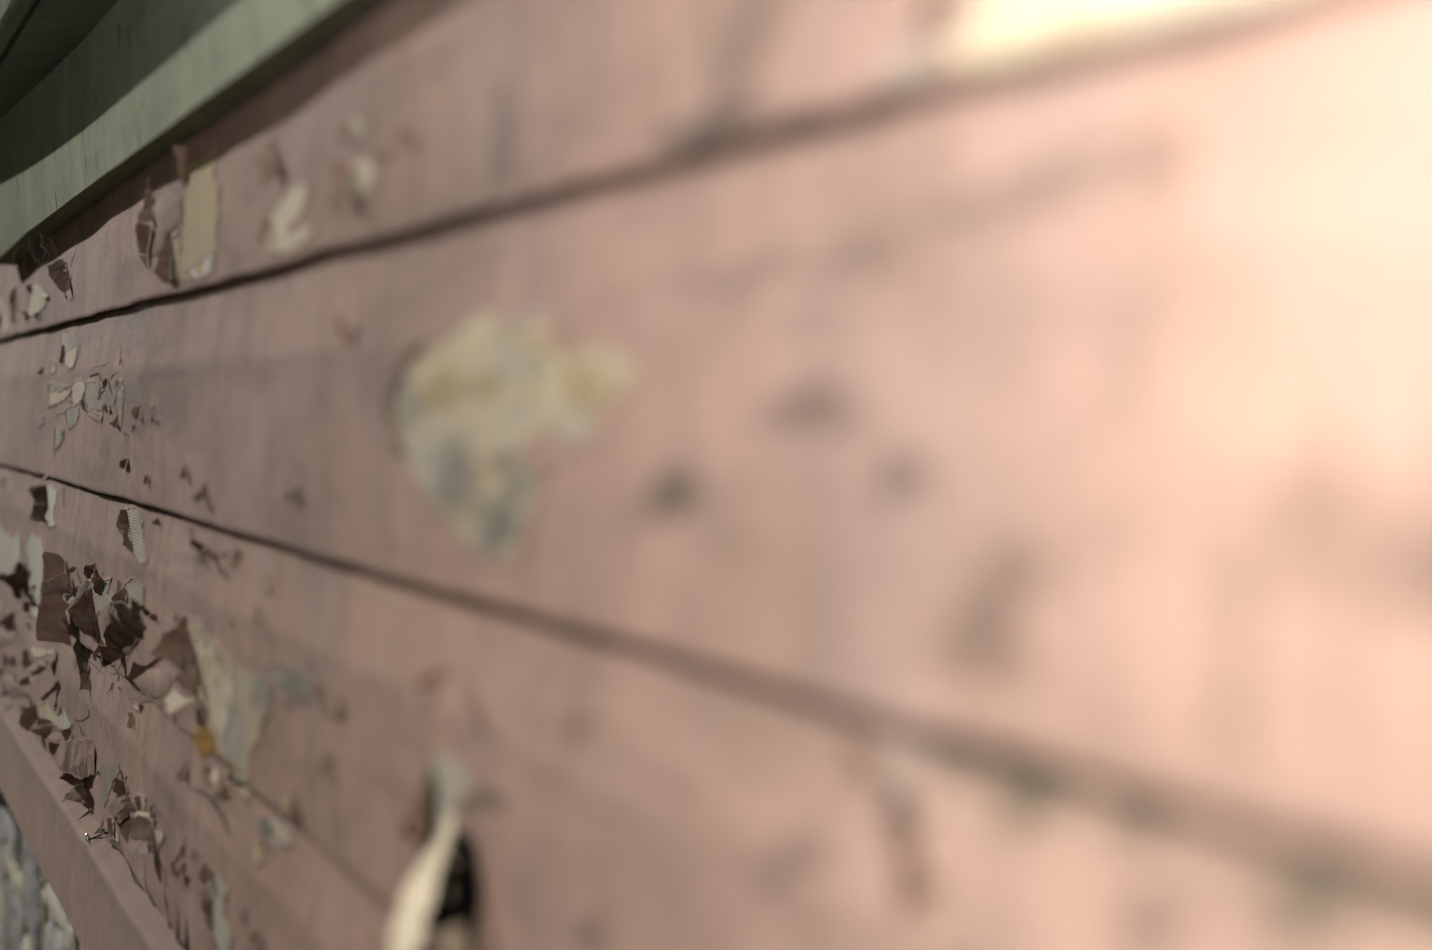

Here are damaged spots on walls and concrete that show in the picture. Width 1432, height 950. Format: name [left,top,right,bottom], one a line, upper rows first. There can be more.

peeling [917,0,1207,61]
peeling [135,144,221,286]
peeling [258,108,403,257]
peeling [0,251,75,336]
peeling [35,328,155,453]
peeling [383,303,640,571]
peeling [0,475,296,950]
peeling [390,745,498,950]